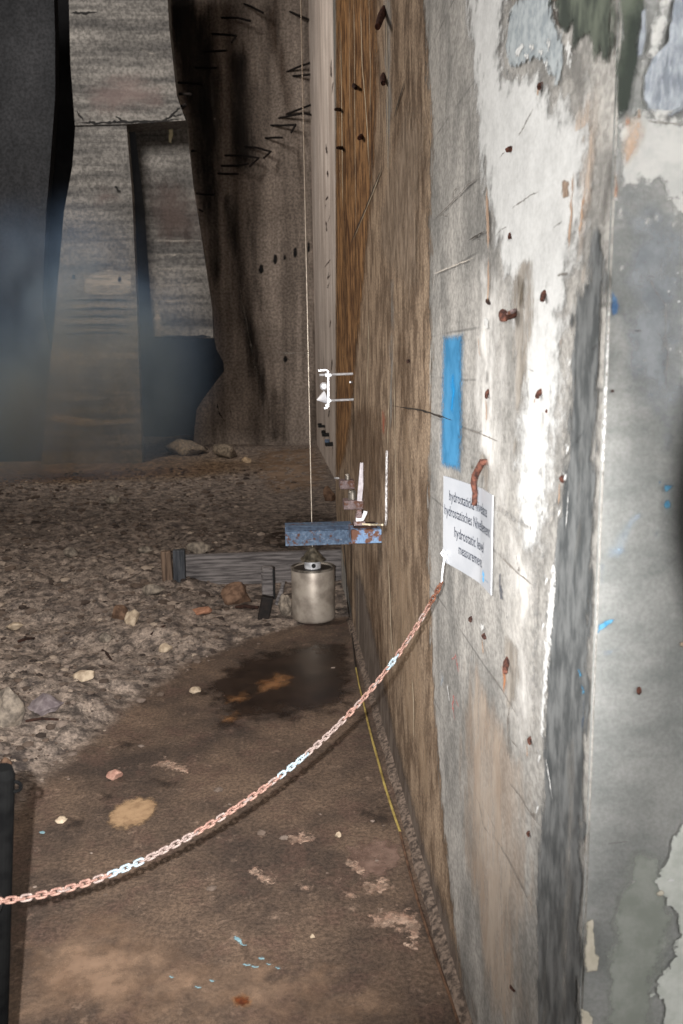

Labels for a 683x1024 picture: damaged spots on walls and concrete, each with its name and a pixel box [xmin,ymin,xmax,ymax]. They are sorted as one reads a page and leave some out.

peeling [637,0,672,59]
damp [245,316,265,401]
damp [258,0,463,992]
peeling [650,824,683,1024]
damp [47,945,160,1001]